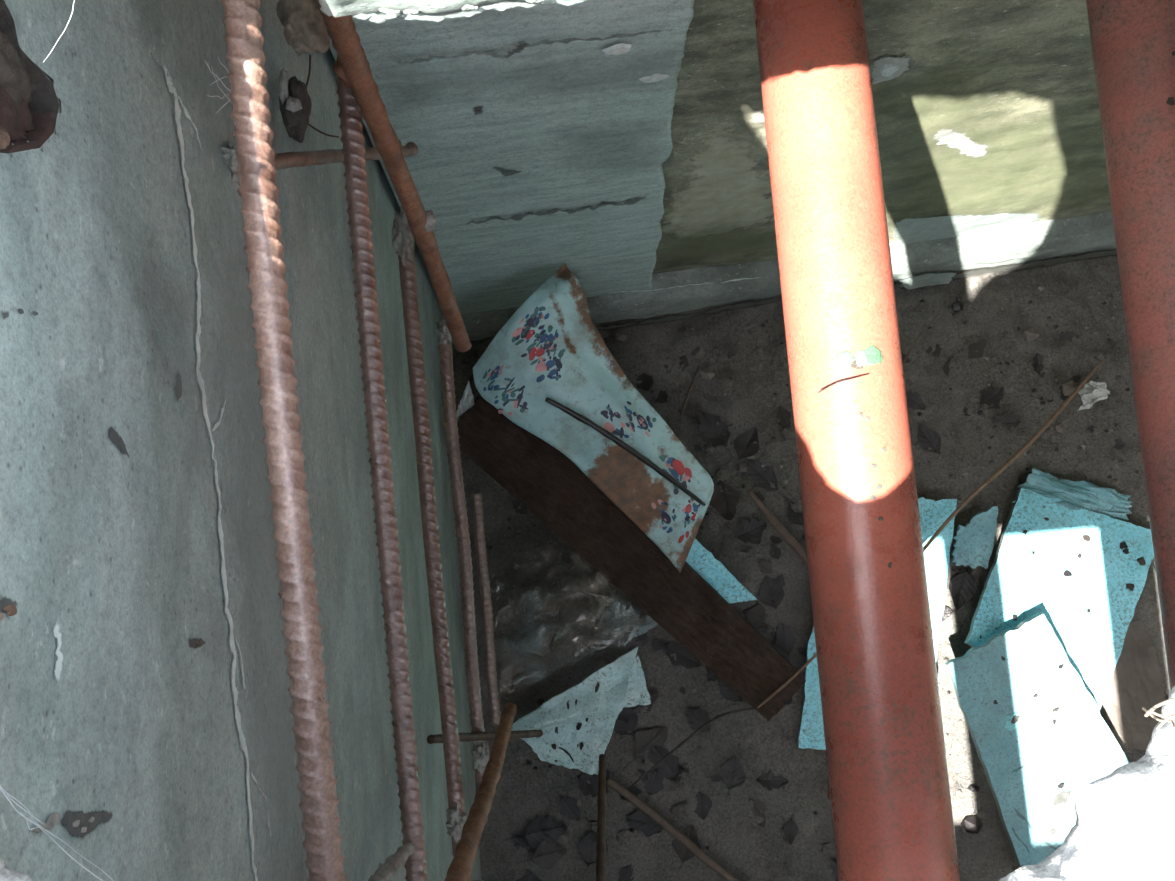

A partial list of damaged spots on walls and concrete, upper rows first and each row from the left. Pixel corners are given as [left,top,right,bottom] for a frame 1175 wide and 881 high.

crack [400,30,660,63]
spalling [0,0,61,157]
damp [660,116,774,242]
crack [468,198,644,224]
damp [952,249,1117,280]
damp [595,297,782,330]
crack [154,53,271,881]
spalling [0,597,17,621]
spalling [32,810,113,838]